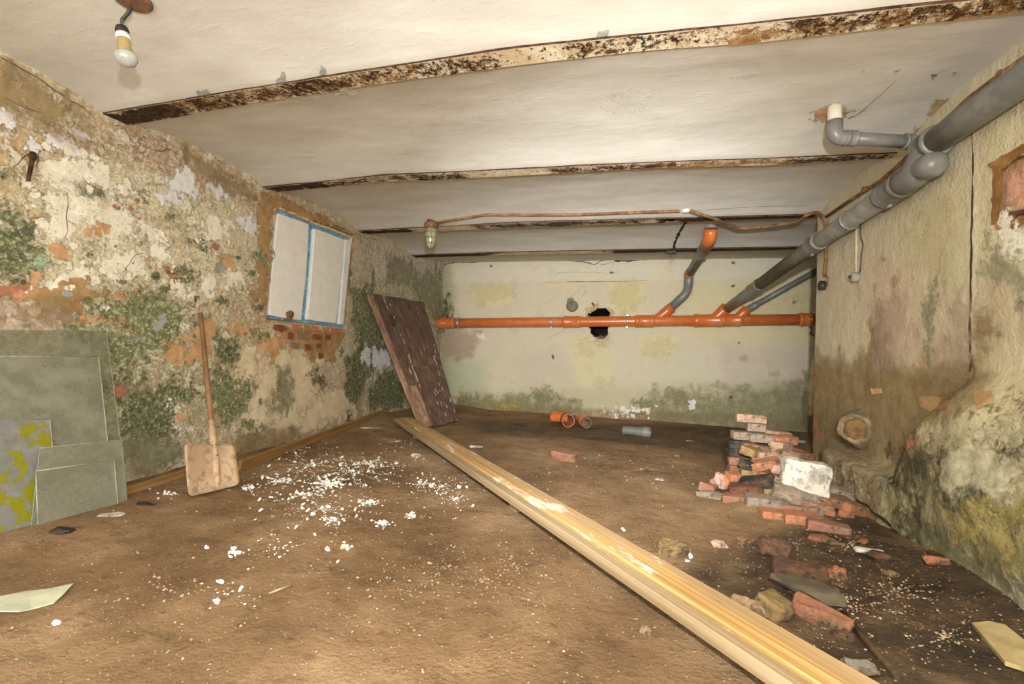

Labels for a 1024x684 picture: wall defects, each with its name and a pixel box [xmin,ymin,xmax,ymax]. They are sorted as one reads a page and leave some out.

corrosion [560,0,1024,59]
peeling [0,106,22,129]
corrosion [104,53,507,125]
corrosion [267,172,468,192]
corrosion [548,154,893,174]
spalling [988,144,1024,264]
peeling [0,127,359,446]
crack [922,133,976,422]
spalling [585,301,615,339]
water stain [238,405,299,455]
water stain [601,398,658,419]
water stain [807,306,1000,546]